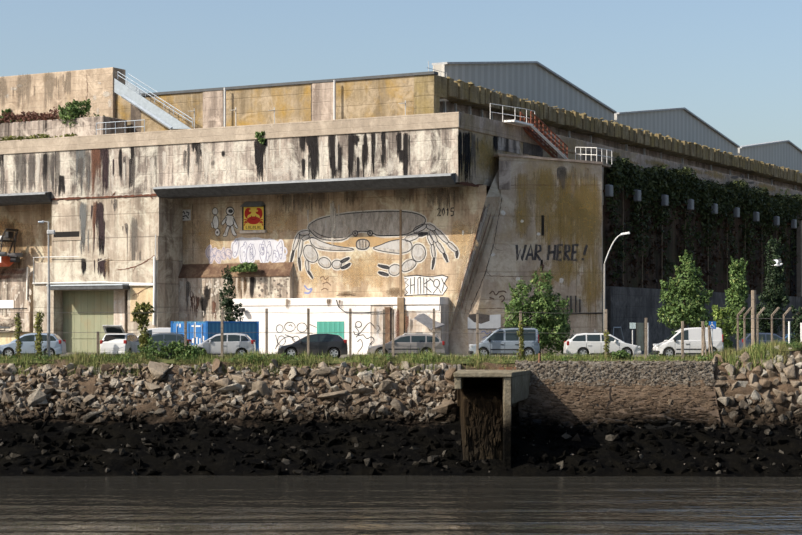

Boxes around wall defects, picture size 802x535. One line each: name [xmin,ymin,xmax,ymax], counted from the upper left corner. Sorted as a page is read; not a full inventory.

damp [0,76,35,103]
damp [45,72,70,101]
damp [0,151,65,197]
damp [74,150,90,191]
corrosion [91,149,101,191]
damp [254,132,410,181]
damp [428,131,478,212]
damp [79,147,167,278]
damp [536,167,599,316]
damp [186,282,211,318]